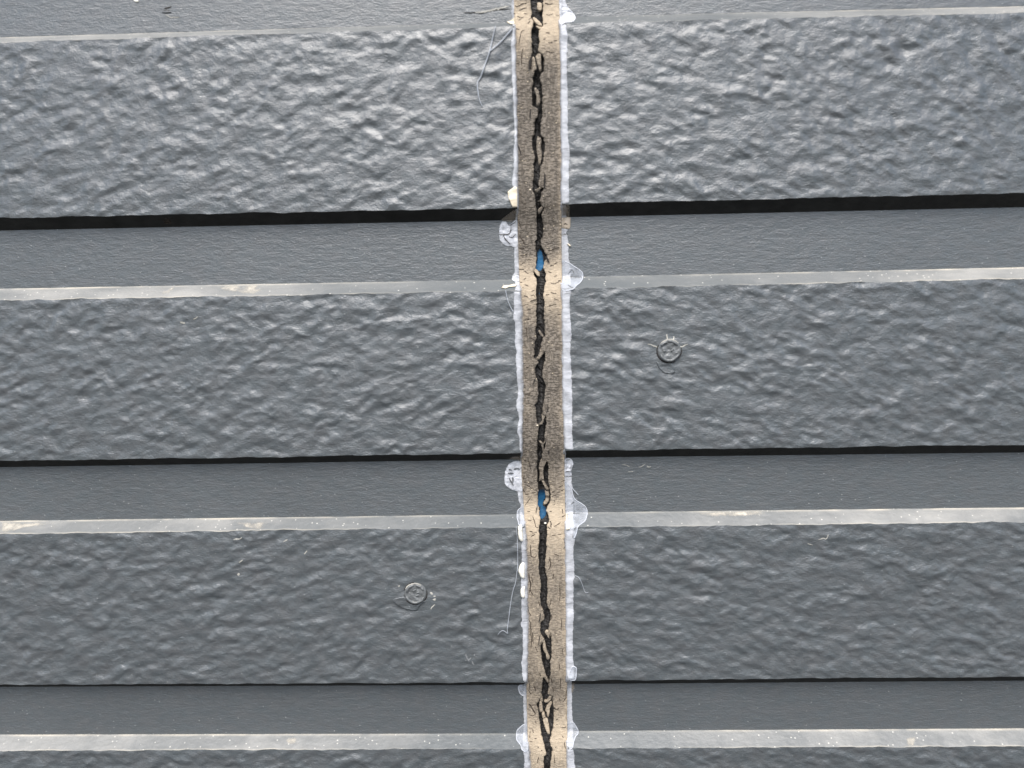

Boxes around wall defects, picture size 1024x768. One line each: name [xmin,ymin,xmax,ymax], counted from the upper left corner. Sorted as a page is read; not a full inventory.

crack [464,0,581,768]